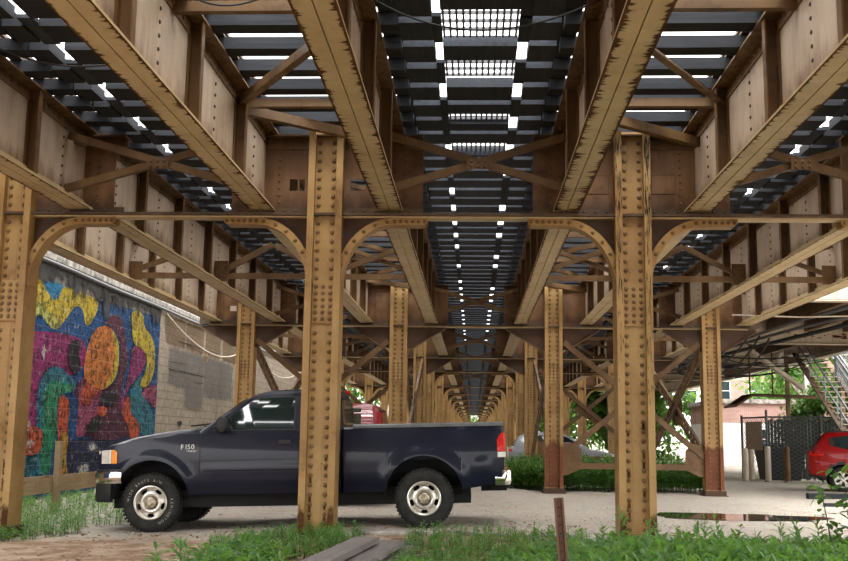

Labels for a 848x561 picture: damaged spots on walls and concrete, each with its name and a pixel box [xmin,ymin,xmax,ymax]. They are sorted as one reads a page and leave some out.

rust [545,441,563,488]
rust [705,447,725,490]